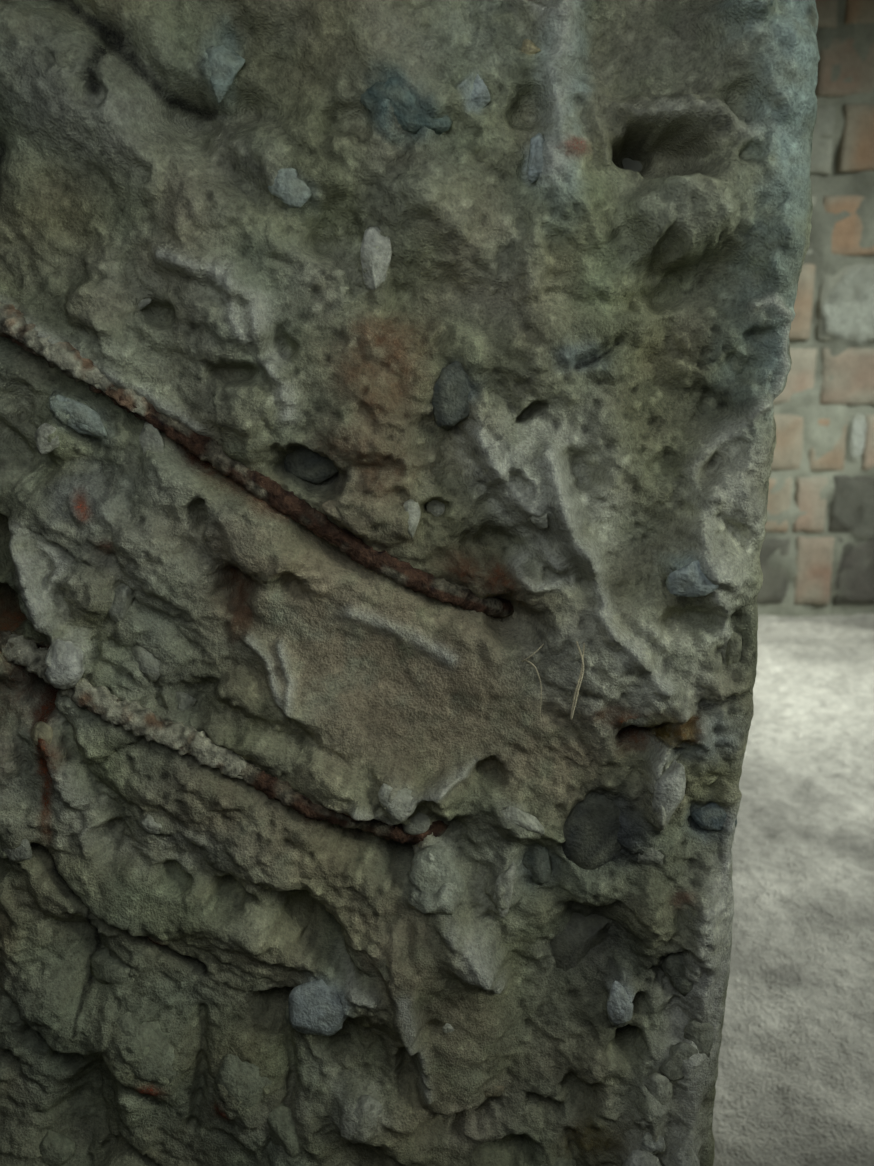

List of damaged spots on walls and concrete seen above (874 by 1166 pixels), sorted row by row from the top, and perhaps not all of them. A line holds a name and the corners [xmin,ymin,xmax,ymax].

spalling [206,45,246,105]
spalling [609,109,726,182]
spalling [360,226,392,291]
spalling [641,241,787,446]
spalling [654,442,767,619]
spalling [725,632,742,667]
spalling [233,570,581,803]
rust [36,738,53,832]
spalling [378,783,417,823]
spalling [691,802,727,831]
spalling [407,844,465,897]
spalling [659,952,694,997]